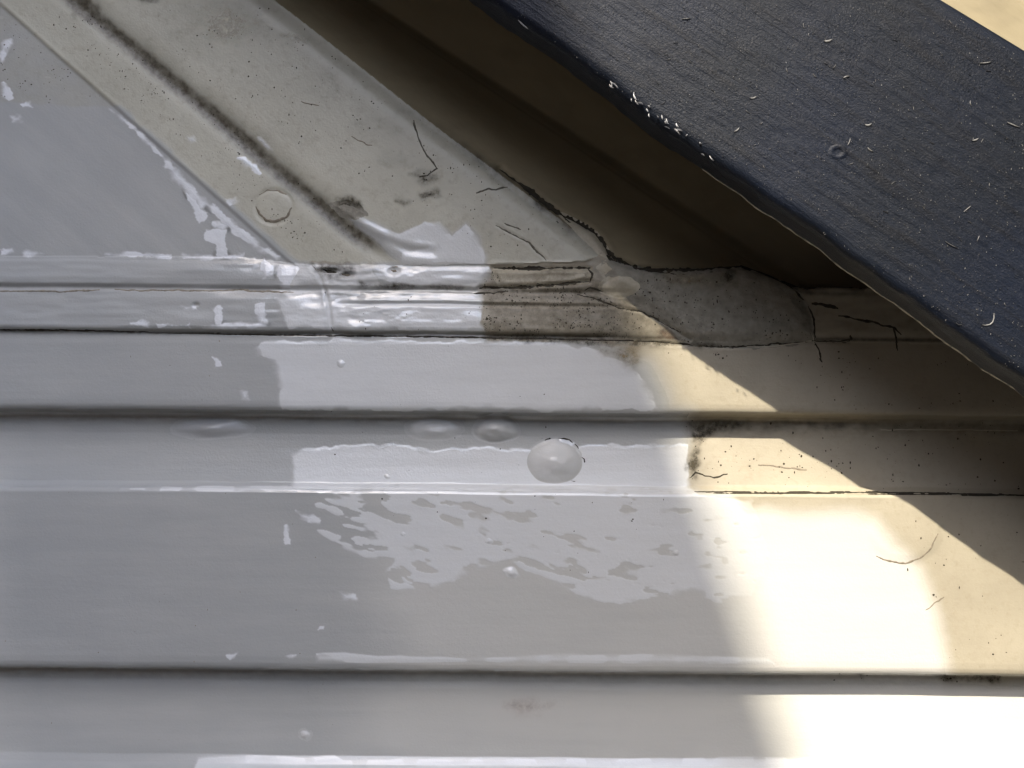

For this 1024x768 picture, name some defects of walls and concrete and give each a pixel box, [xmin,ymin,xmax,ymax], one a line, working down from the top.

crack [413,120,438,177]
crack [0,170,902,362]
leakage [483,271,800,359]